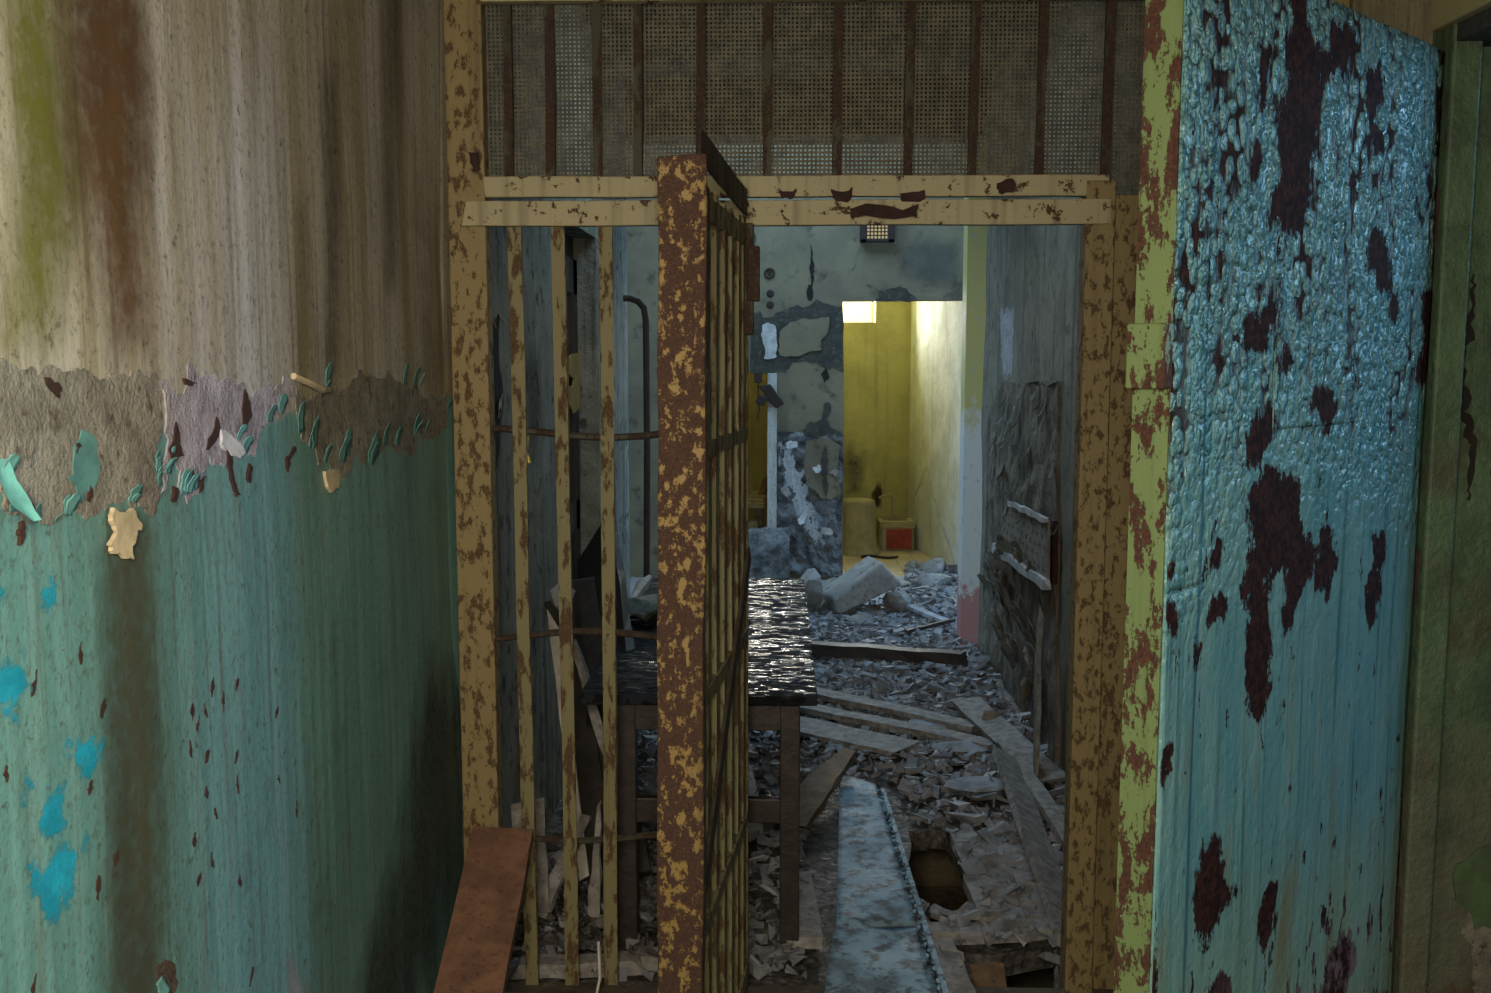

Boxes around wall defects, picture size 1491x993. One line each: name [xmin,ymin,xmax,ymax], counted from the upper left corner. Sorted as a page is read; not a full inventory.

peeling [0,357,453,559]